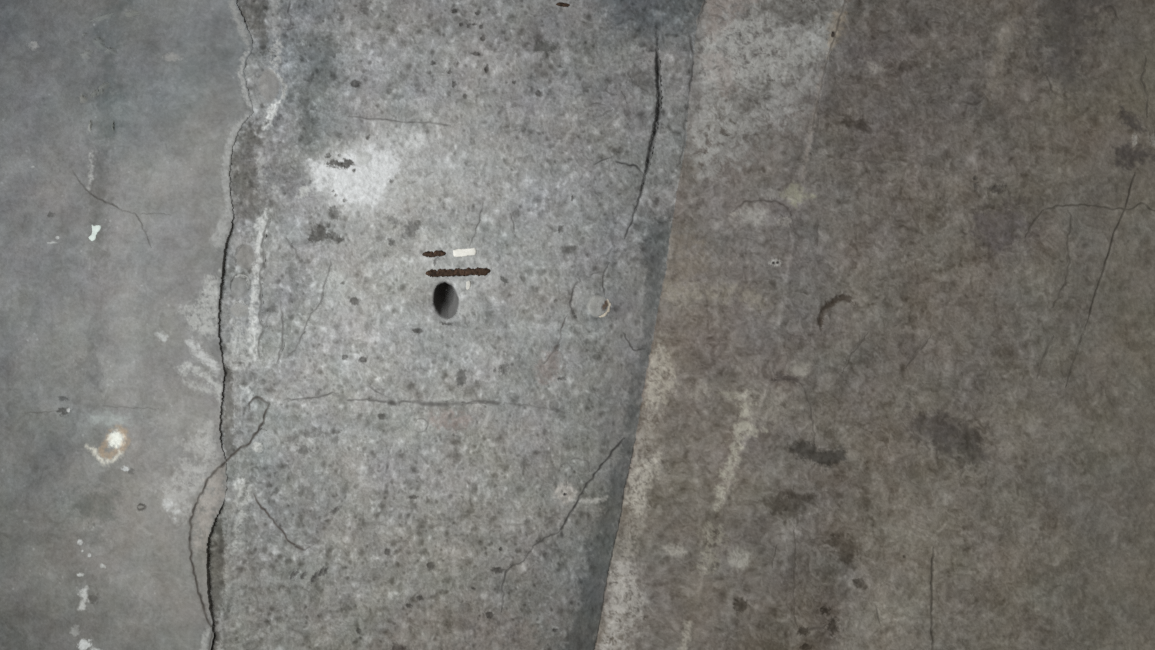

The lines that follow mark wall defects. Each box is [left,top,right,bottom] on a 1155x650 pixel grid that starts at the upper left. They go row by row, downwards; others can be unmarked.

crack [543,0,707,364]
crack [1024,172,1155,387]
crack [1139,55,1149,118]
damp [69,571,104,650]
damp [59,328,143,569]
crack [187,385,569,650]
crack [500,438,636,650]